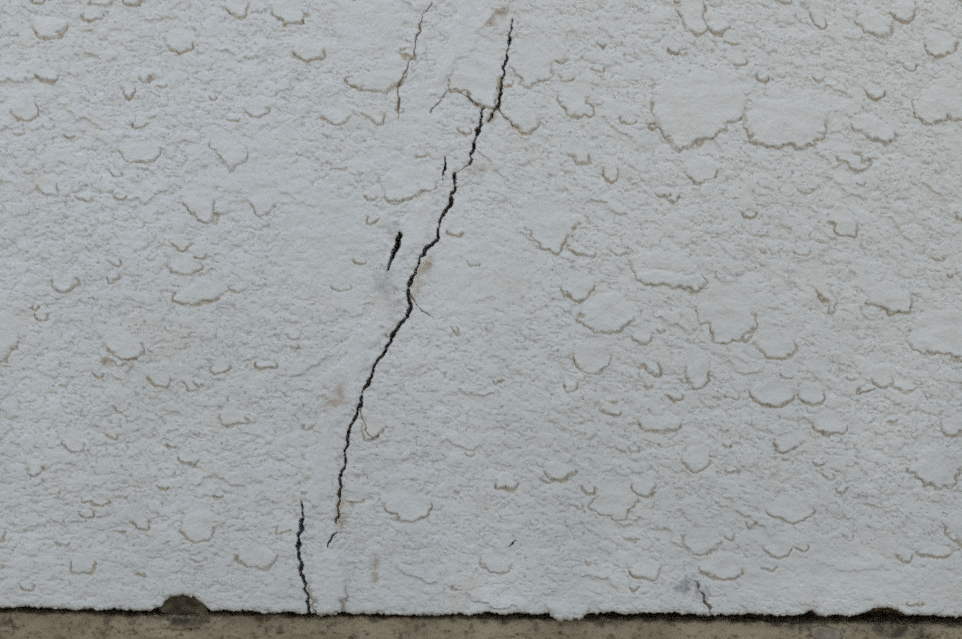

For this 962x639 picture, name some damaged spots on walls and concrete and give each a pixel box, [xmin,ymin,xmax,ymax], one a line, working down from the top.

crack [327,2,519,548]
crack [295,502,311,612]